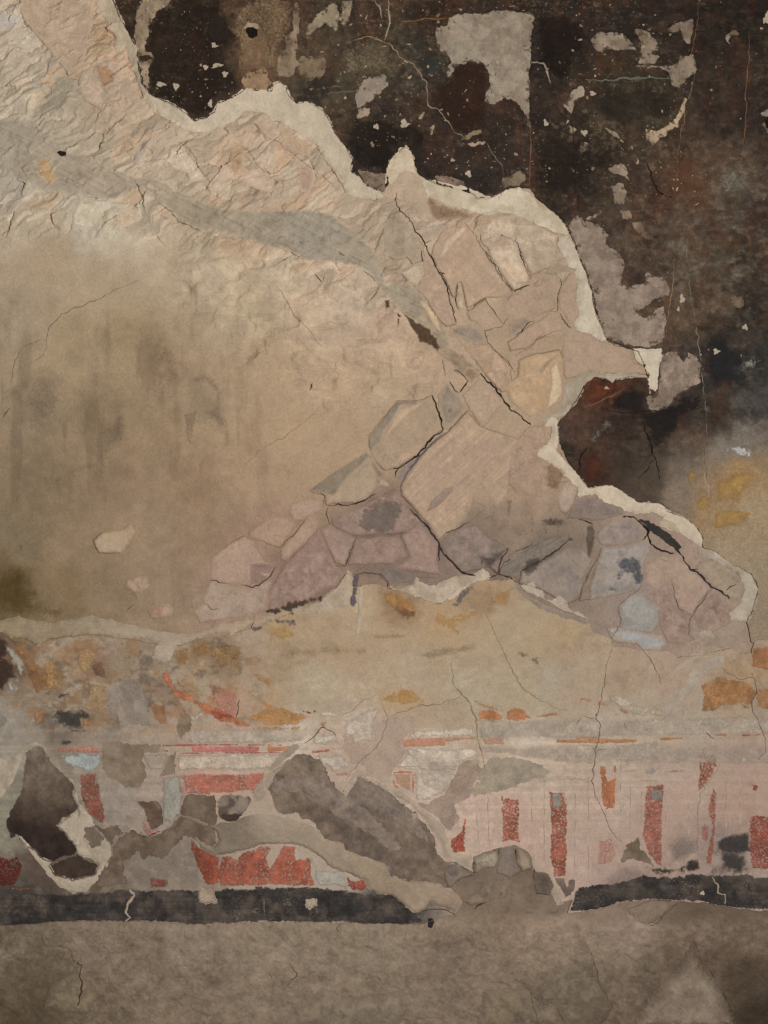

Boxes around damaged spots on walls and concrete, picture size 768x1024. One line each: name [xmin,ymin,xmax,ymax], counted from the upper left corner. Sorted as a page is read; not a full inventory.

flaking render [203,0,354,90]
flaking render [435,10,535,127]
flaking render [591,19,697,145]
crack [394,193,571,477]
flaking render [568,211,702,411]
crack [585,238,711,498]
crack [335,538,403,589]
crack [410,509,593,582]
crack [623,516,736,638]
crack [486,587,641,838]
flaking render [6,741,251,886]
flaking render [268,716,549,888]